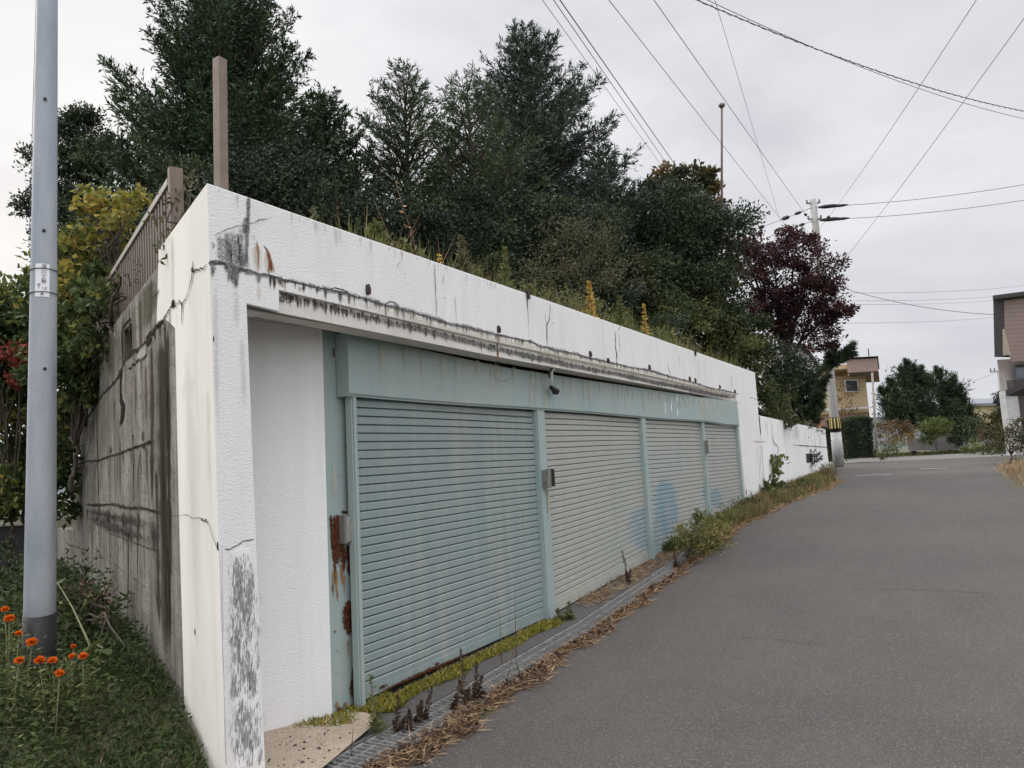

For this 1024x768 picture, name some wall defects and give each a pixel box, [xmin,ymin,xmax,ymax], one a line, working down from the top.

damp [211,198,251,287]
corrosion [254,236,283,288]
crack [87,218,779,453]
damp [257,274,734,417]
damp [78,280,171,641]
crack [170,514,253,673]
corrosion [329,510,352,656]